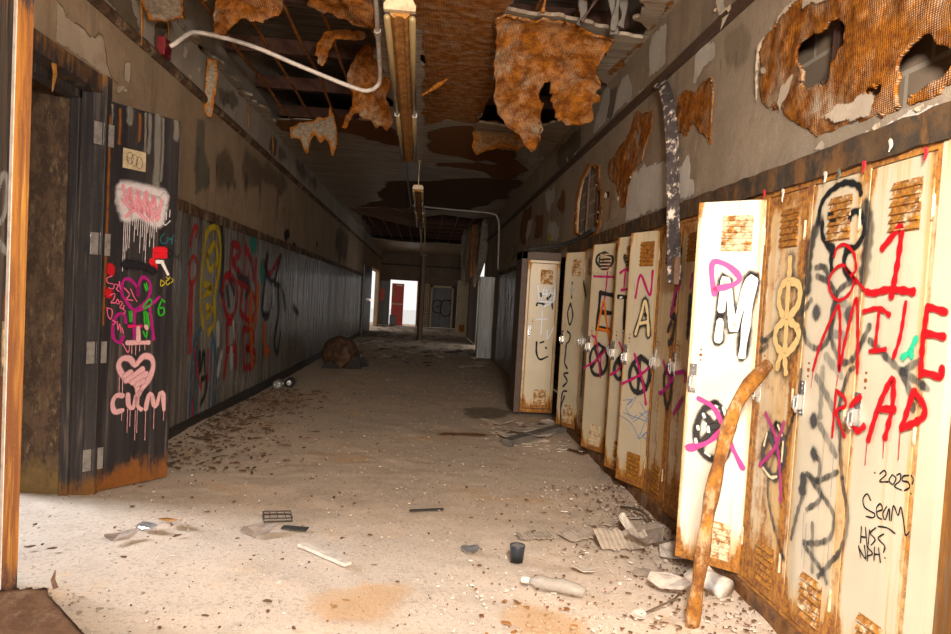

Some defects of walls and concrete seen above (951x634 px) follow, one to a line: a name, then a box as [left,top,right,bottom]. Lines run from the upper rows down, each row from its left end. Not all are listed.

peeling [154,22,168,49]
peeling [649,23,667,77]
peeling [693,41,715,84]
peeling [714,0,731,30]
peeling [593,74,644,134]
spalling [865,103,939,133]